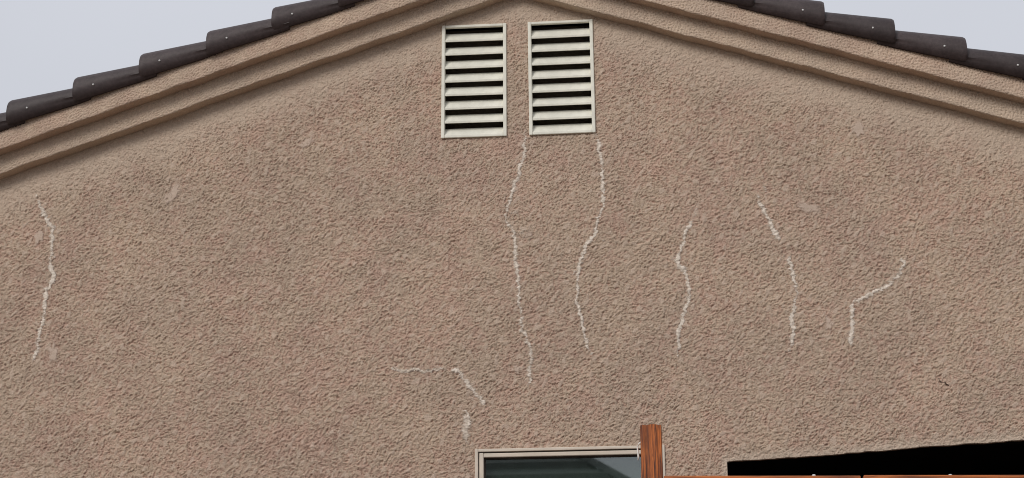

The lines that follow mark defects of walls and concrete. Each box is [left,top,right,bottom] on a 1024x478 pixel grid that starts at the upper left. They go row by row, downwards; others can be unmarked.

crack [32,194,56,360]
crack [504,137,533,384]
crack [573,135,606,354]
crack [674,208,697,357]
crack [757,186,799,352]
crack [848,258,906,345]
crack [391,367,485,405]